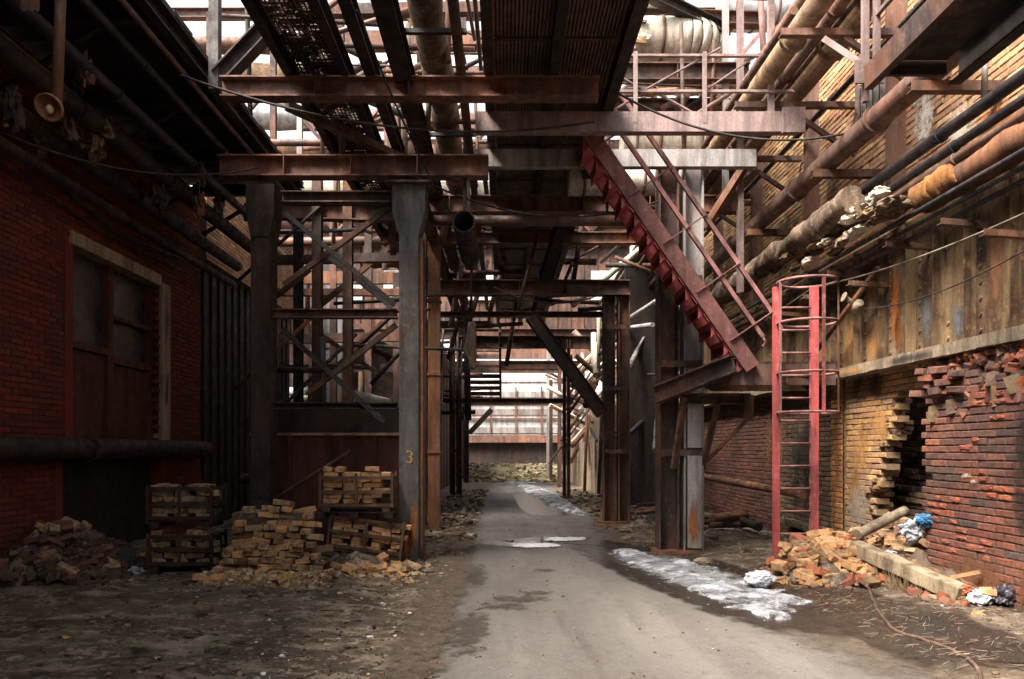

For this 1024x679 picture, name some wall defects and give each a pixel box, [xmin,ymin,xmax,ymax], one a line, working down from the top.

rust [888,261,901,347]
rust [989,238,1005,304]
spalling [965,390,1016,420]
spalling [864,398,914,519]
spalling [978,470,1024,501]
spalling [927,495,993,562]